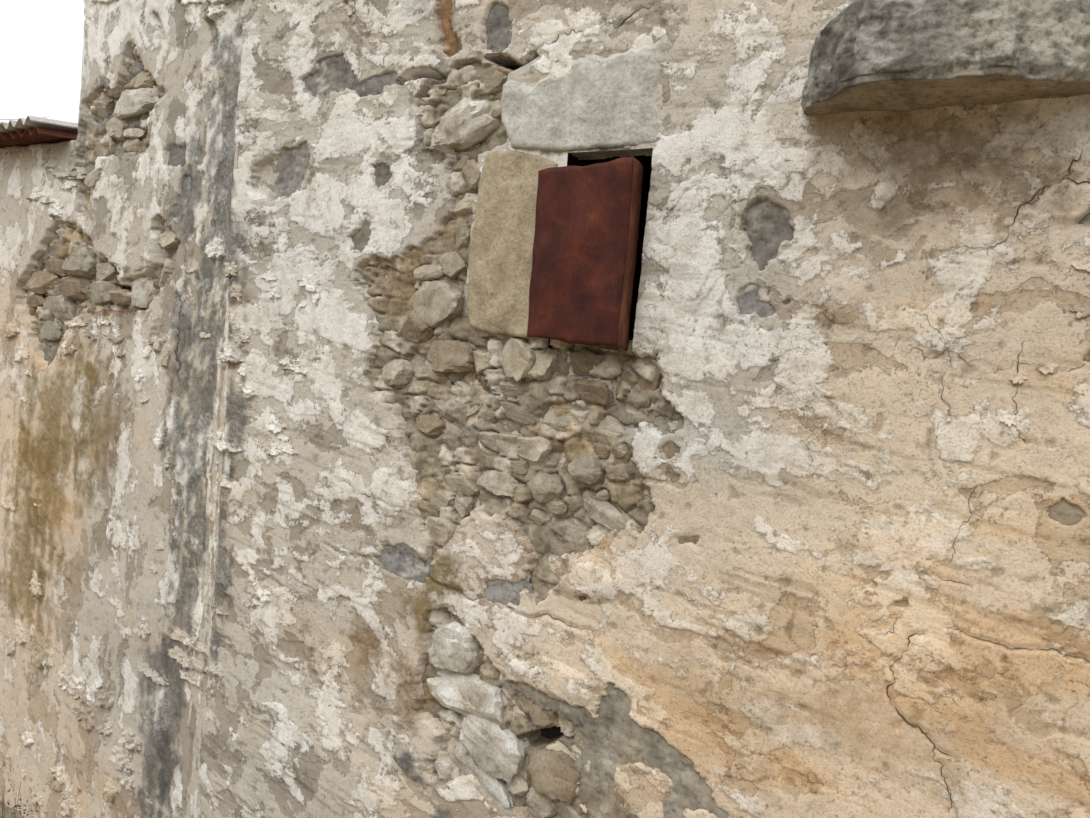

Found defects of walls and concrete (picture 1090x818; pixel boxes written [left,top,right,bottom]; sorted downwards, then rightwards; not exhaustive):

spalling [1,44,198,404]
peeling [204,234,255,400]
peeling [272,142,310,200]
peeling [275,350,313,375]
peeling [298,272,322,307]
spalling [352,0,684,606]
crack [987,142,1090,254]
water stain [6,359,117,623]
peeling [151,428,171,471]
spalling [421,609,729,818]
crack [866,615,1090,811]